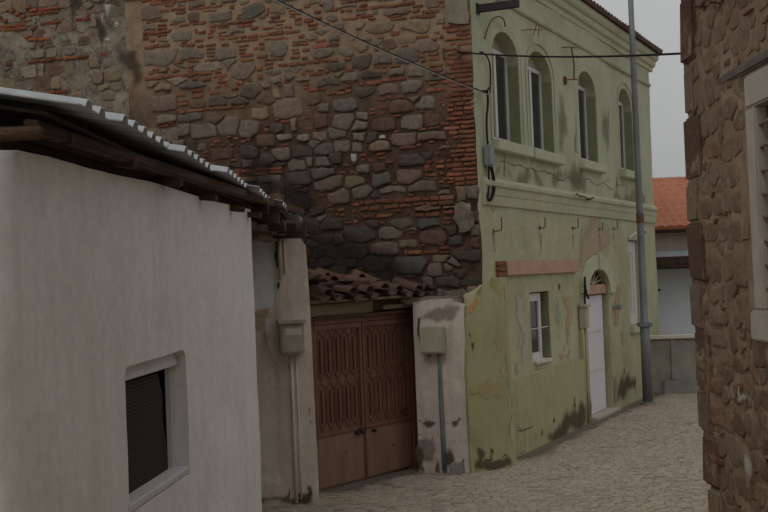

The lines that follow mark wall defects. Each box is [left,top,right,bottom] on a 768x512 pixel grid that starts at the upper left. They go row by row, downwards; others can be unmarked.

crack [692,0,724,11]
crack [498,161,633,200]
damp [542,393,592,441]
damp [475,448,511,470]